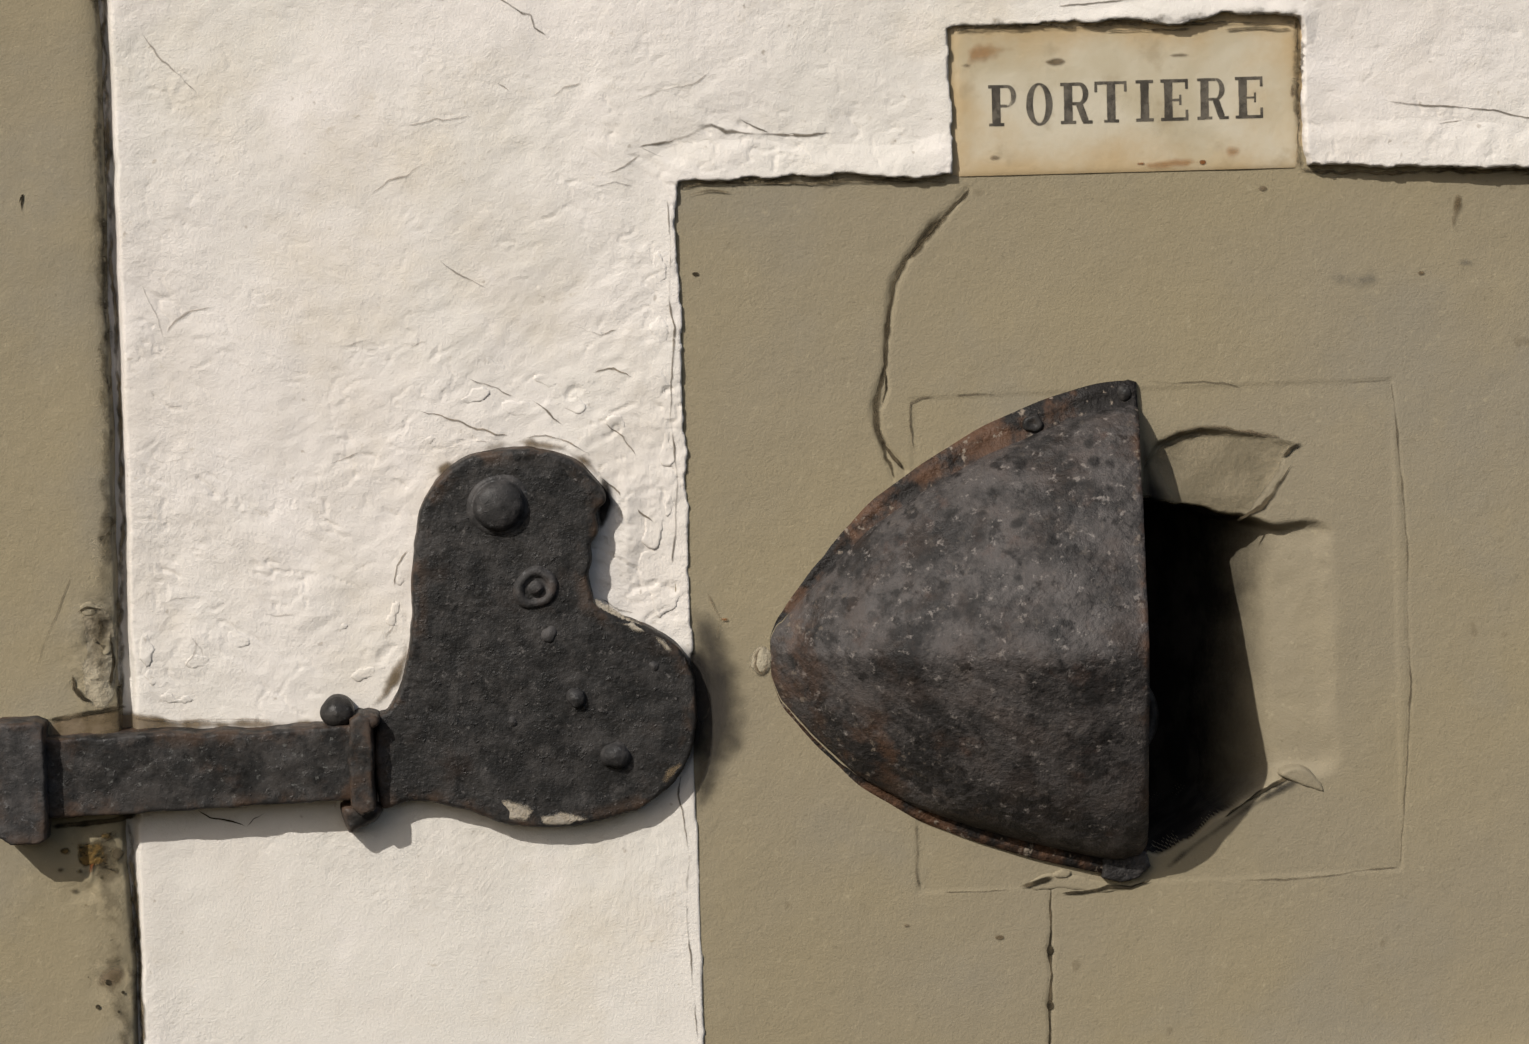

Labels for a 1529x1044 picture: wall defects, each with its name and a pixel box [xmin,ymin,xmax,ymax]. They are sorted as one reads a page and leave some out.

crack [615,141,672,171]
crack [710,122,825,137]
crack [957,0,1529,175]
crack [667,177,973,476]
spalling [1142,426,1300,520]
crack [1372,670,1412,870]
crack [1045,892,1053,1044]